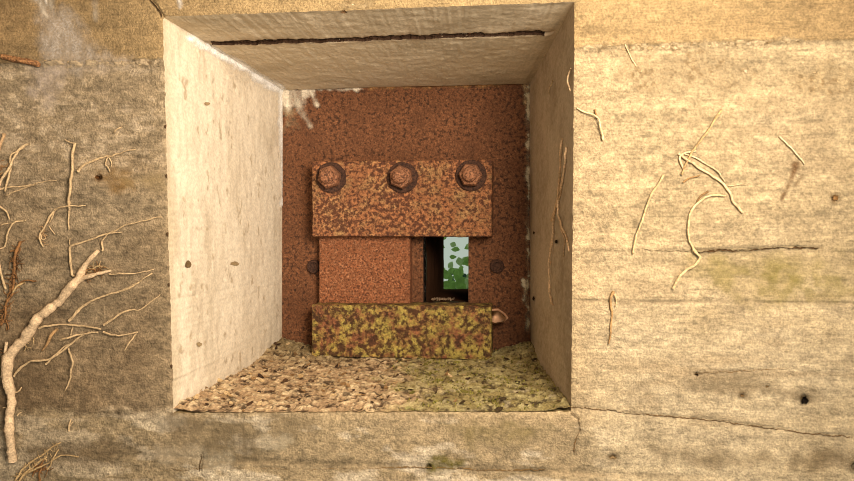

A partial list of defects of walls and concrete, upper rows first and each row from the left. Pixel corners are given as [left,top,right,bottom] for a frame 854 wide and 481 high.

crack [211,30,545,45]
damp [187,35,331,205]
crack [642,245,818,253]
crack [571,407,849,453]